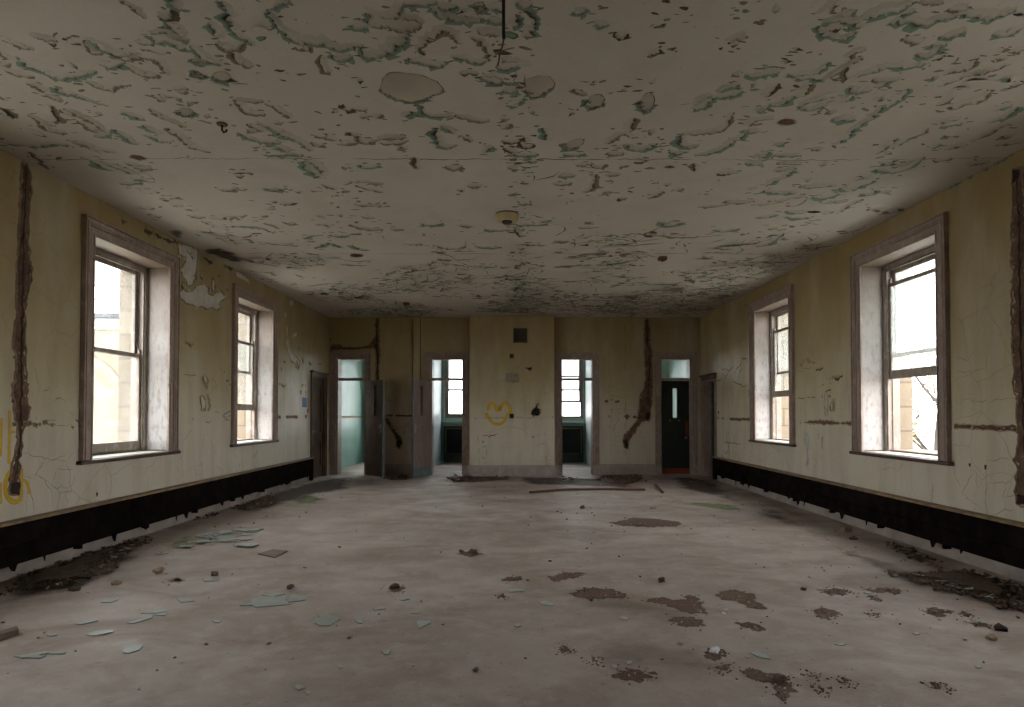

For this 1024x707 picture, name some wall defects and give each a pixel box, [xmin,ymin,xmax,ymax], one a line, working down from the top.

peeling [0,0,1024,508]